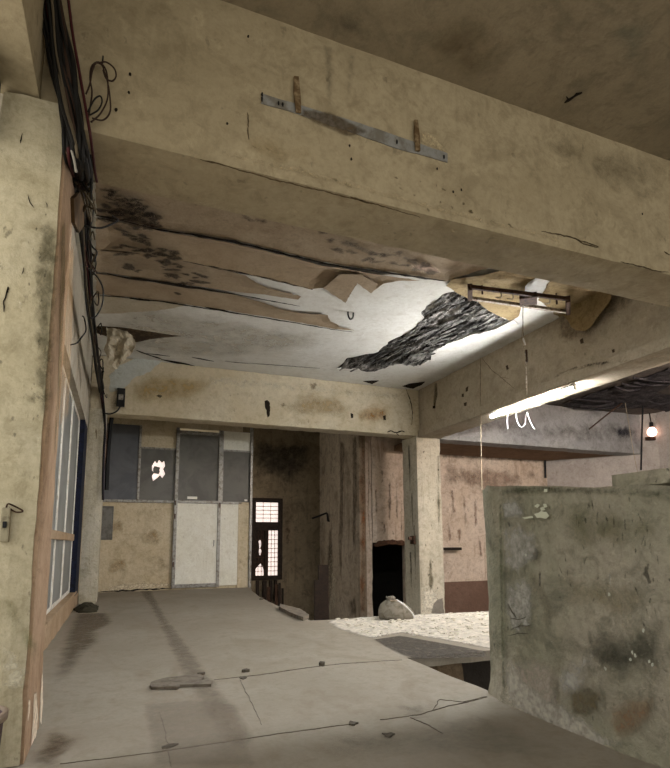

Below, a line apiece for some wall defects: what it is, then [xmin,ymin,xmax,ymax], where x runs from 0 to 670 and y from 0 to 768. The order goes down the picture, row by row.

damp [38,224,65,447]
damp [96,189,210,295]
crack [96,215,444,281]
crack [200,159,419,217]
peeling [95,183,535,392]
crack [542,231,599,248]
peeling [538,281,612,344]
damp [500,505,609,746]